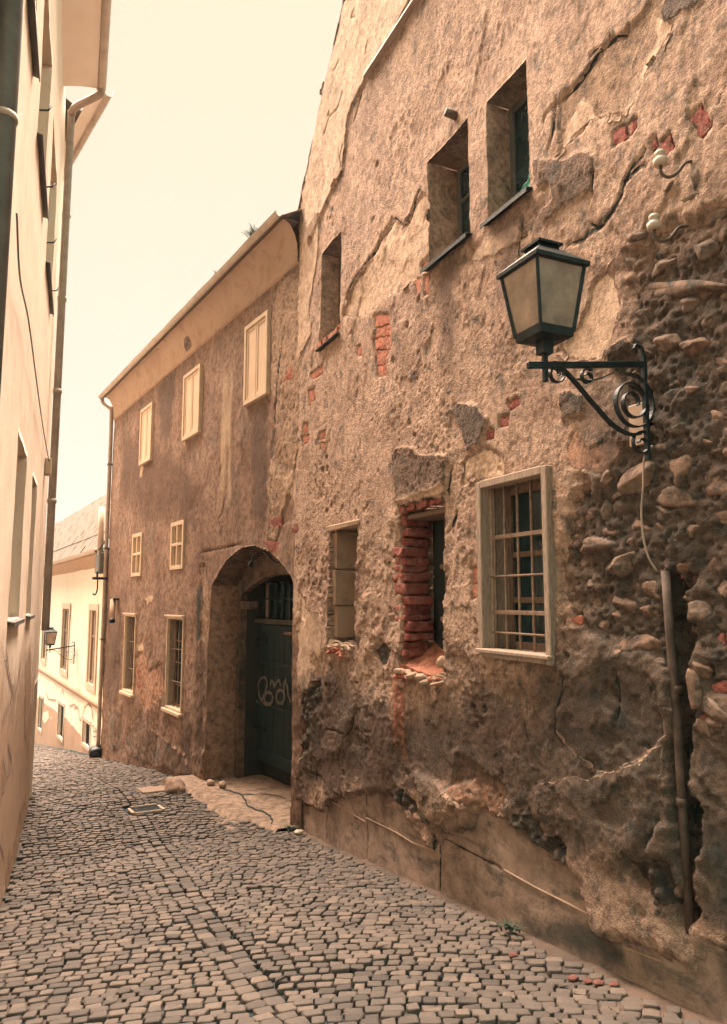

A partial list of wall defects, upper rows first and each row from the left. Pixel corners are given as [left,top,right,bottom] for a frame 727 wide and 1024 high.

crack [547,34,629,144]
peeling [554,0,675,161]
peeling [283,0,408,382]
crack [344,194,418,305]
peeling [334,194,430,377]
crack [569,149,646,245]
peeling [460,398,520,486]
crack [554,677,564,747]
spalling [387,789,418,813]
crack [432,834,495,891]
peeling [442,758,567,865]
spalling [631,860,684,906]